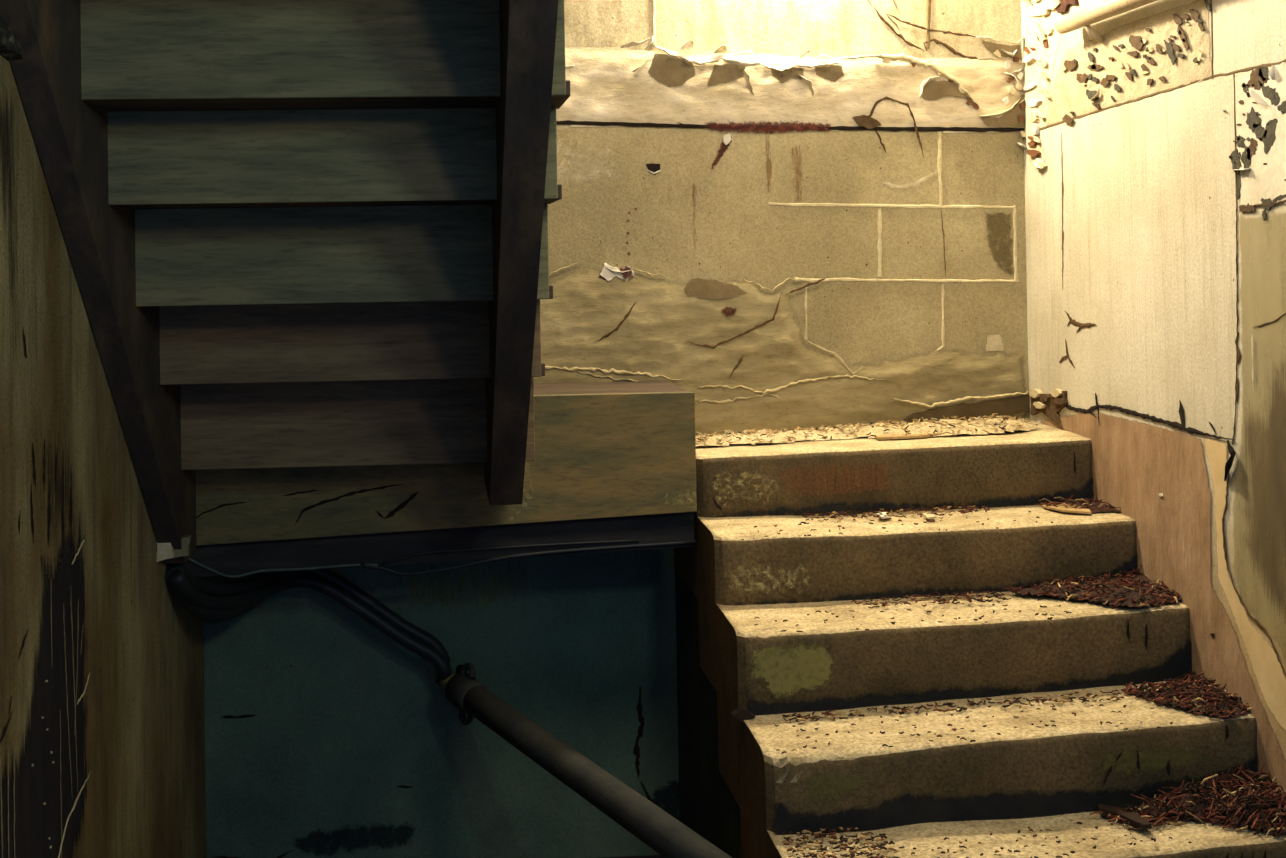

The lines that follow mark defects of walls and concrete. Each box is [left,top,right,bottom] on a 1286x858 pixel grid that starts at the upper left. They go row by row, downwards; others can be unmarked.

crack [556,120,710,128]
spalling [646,163,661,174]
crack [805,308,862,375]
spalling [620,0,1212,170]
crack [822,96,1024,157]
crack [939,212,947,275]
crack [1059,133,1096,368]
crack [1039,209,1286,445]
peeling [1223,62,1286,221]
crack [283,484,418,524]
water stain [1233,214,1286,662]
water stain [0,441,87,858]